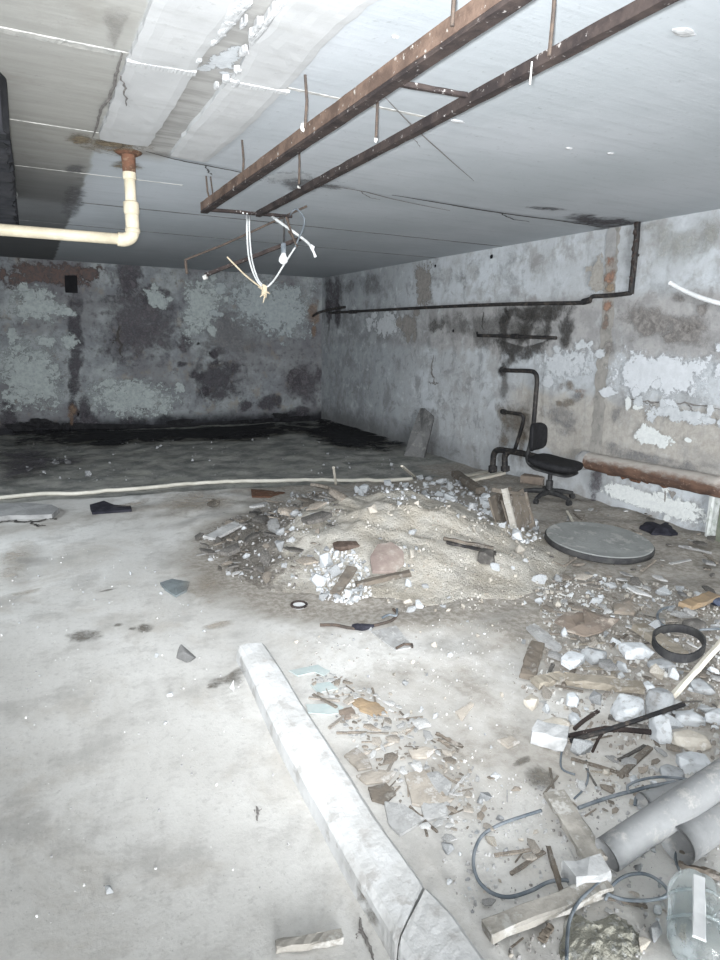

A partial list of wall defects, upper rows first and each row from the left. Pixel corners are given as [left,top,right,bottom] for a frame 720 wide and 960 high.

spalling [195,0,286,90]
crack [91,53,128,138]
rust [70,135,134,152]
crack [322,185,630,229]
spalling [0,258,108,292]
peeling [34,332,81,351]
peeling [574,339,613,359]
peeling [626,304,707,343]
leakage [1,264,403,480]
leakage [430,314,530,457]
peeling [599,386,720,449]
spalling [657,488,676,502]